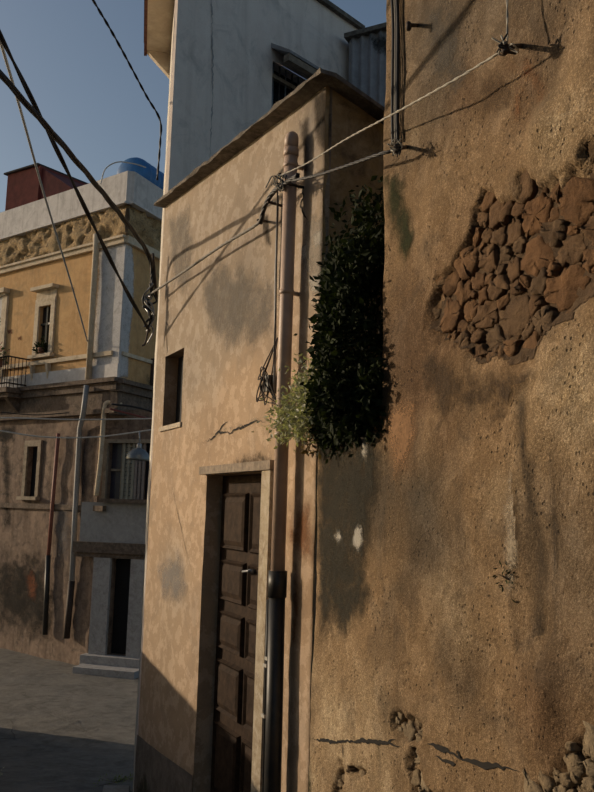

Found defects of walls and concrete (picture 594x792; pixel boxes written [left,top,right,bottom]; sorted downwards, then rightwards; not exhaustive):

spalling [425,141,594,414]
crack [202,418,263,443]
damp [317,428,380,633]
damp [506,502,516,580]
damp [0,552,51,637]
spalling [337,765,366,792]
crack [312,738,402,754]
spalling [396,712,432,792]
crack [427,743,517,771]
spalling [522,720,594,792]